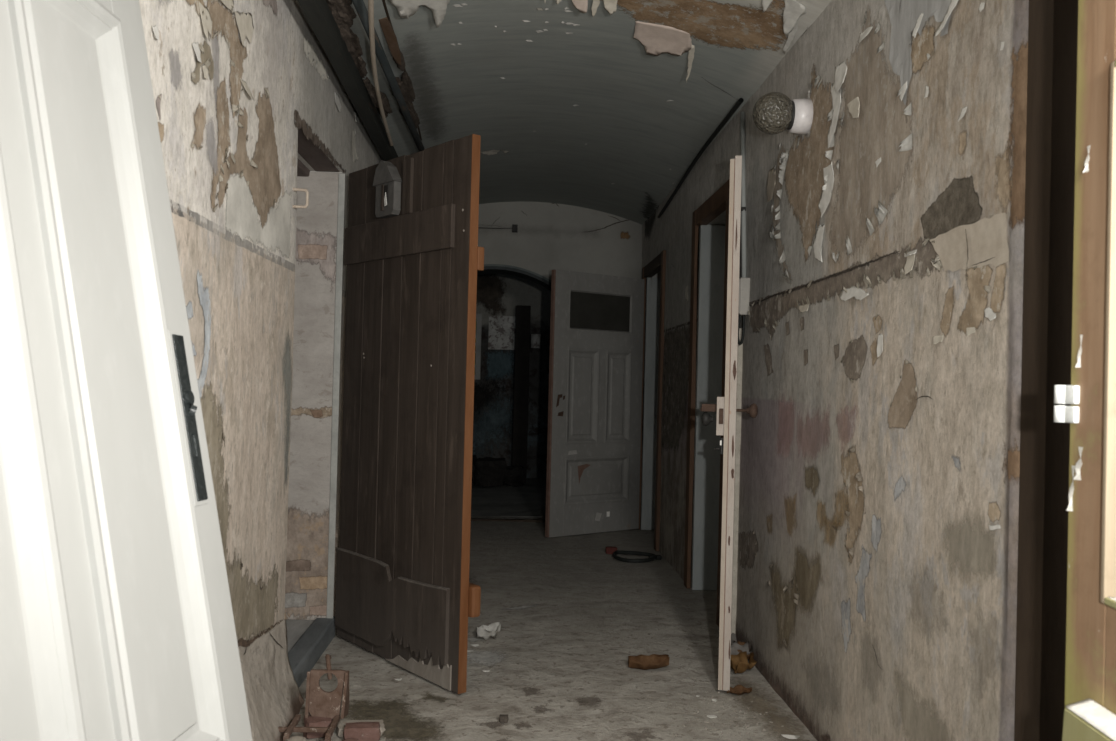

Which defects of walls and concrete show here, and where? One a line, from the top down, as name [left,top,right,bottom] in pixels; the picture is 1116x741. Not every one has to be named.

peeling [303,37,330,81]
flaking render [326,0,420,129]
peeling [389,0,468,28]
peeling [522,0,806,83]
peeling [156,94,164,142]
peeling [186,0,282,228]
peeling [748,0,1012,383]
water stain [284,339,292,481]
flaking render [888,359,932,429]
peeling [840,445,865,563]
peeling [728,531,758,570]
crack [237,620,284,664]